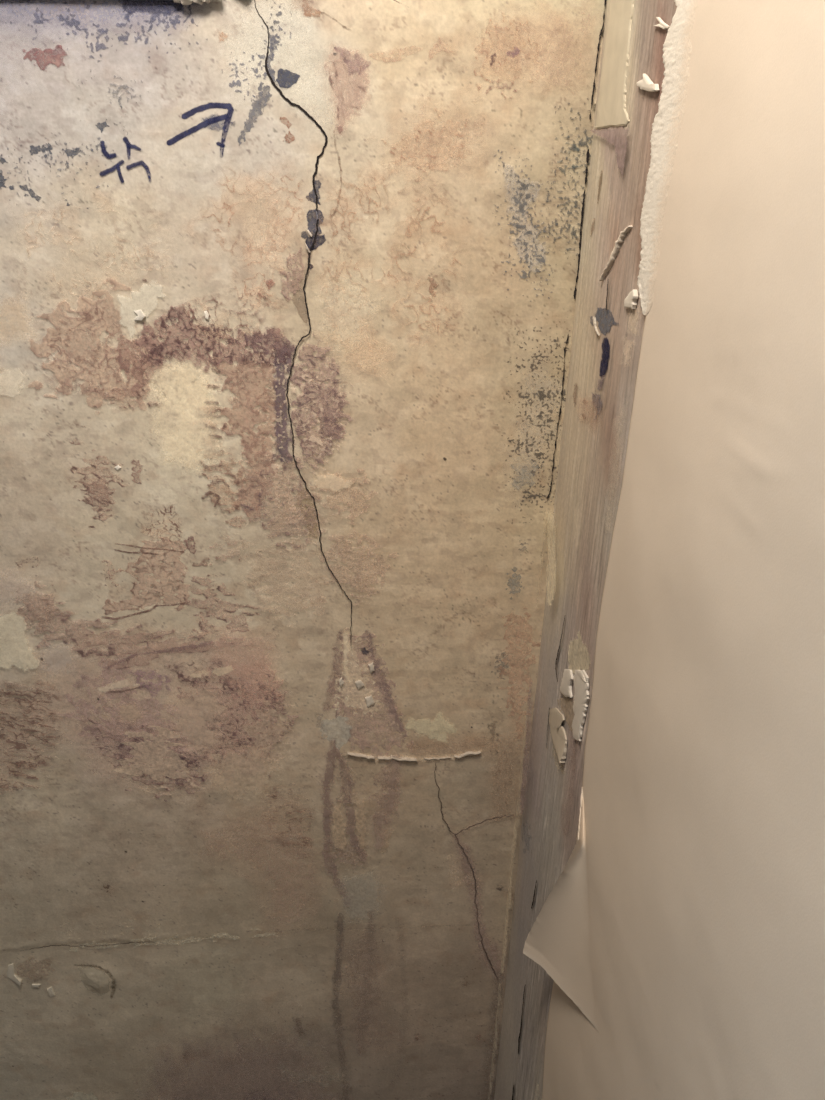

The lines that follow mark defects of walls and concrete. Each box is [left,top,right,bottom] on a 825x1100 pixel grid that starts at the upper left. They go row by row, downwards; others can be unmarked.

water stain [28,250,351,548]
crack [254,0,352,640]
flaking render [549,669,589,763]
water stain [322,740,399,1066]
crack [434,763,513,980]
crack [517,987,525,1053]